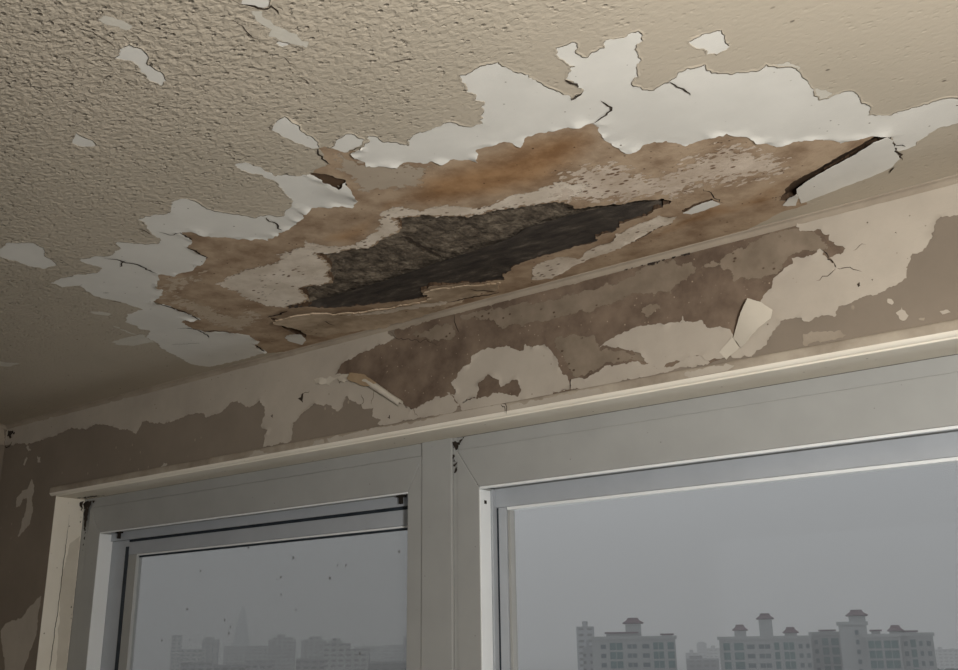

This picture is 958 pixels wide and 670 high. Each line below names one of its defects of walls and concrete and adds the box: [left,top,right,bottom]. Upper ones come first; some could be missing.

peeling [99,16,132,30]
peeling [238,0,309,48]
crack [888,137,906,174]
flaking render [0,29,958,466]
water stain [336,226,844,409]
peeling [16,479,34,537]
peeling [1,596,41,670]